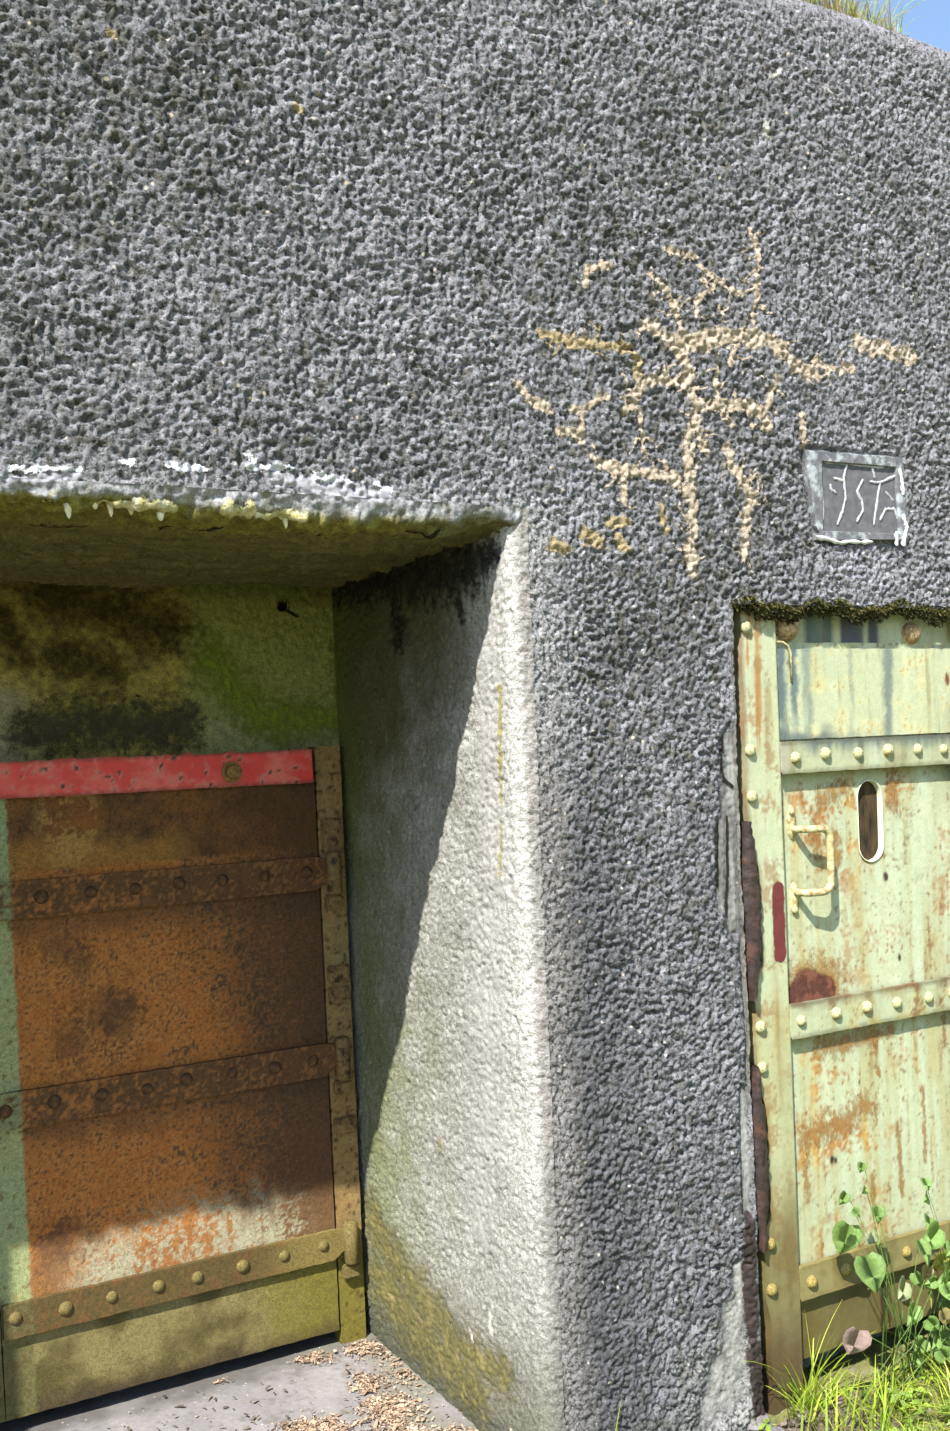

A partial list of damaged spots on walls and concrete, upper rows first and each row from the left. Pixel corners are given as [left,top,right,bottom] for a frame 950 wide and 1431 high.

damp [0,583,193,693]
rust [810,779,850,870]
damp [332,535,502,1229]
rust [788,953,852,1004]
rust [814,1024,895,1077]